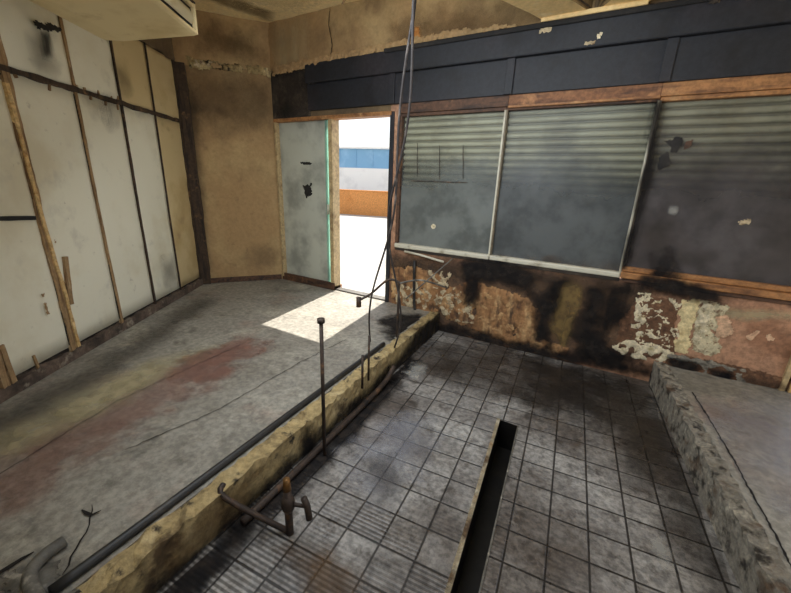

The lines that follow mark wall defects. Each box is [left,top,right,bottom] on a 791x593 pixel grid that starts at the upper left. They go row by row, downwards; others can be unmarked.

damp [42,32,52,55]
damp [464,278,480,306]
damp [550,278,582,347]
flaking render [612,292,791,389]
spalling [200,266,742,593]
crack [692,392,791,566]
spalling [160,538,220,593]